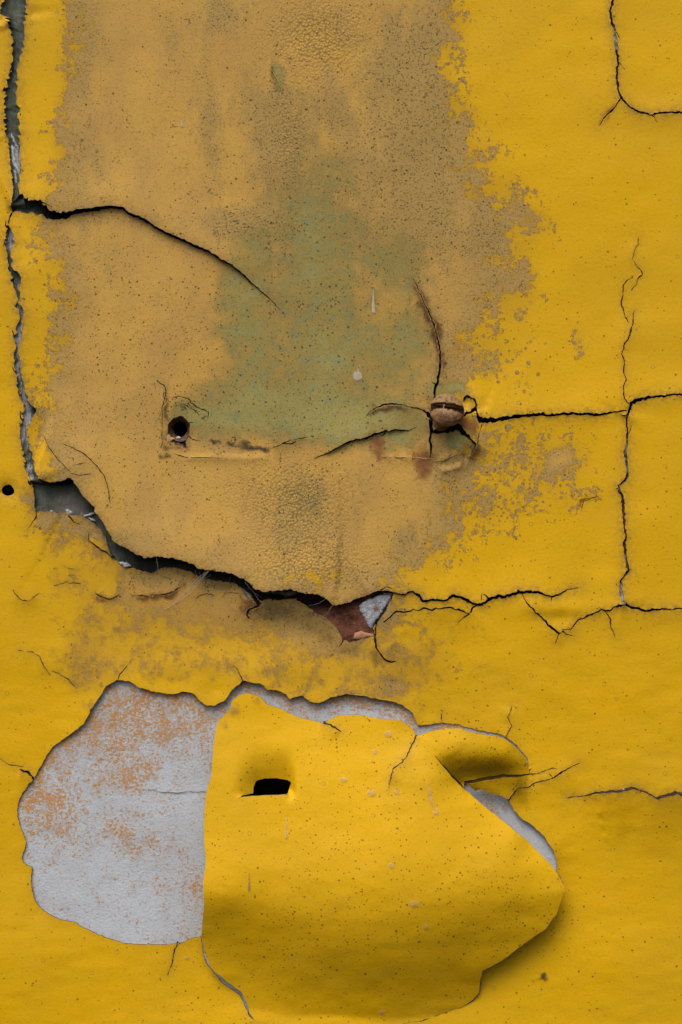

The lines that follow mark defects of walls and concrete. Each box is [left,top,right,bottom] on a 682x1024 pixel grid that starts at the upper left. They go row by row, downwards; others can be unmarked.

crack [600,0,682,124]
crack [0,0,280,500]
crack [273,246,682,663]
crack [15,568,262,619]
peeling [17,680,533,1018]
peeling [462,777,563,883]
crack [507,763,682,800]